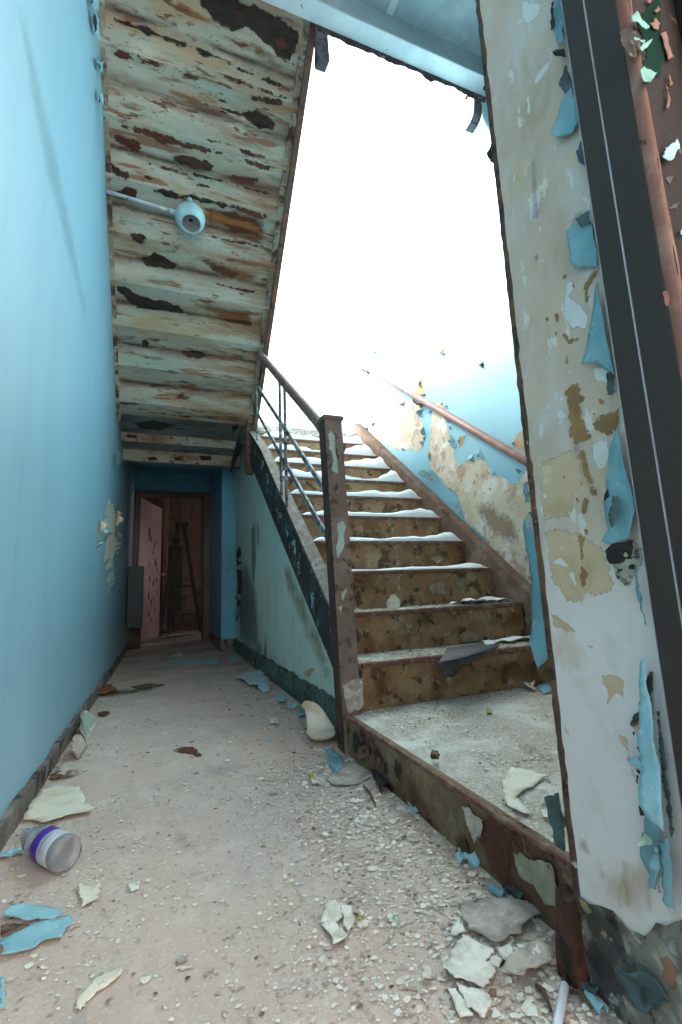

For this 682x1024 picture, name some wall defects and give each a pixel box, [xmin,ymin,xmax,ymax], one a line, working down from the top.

peeling [550,0,585,166]
peeling [620,0,673,109]
peeling [662,138,680,161]
peeling [566,210,597,268]
peeling [581,282,615,395]
peeling [96,498,123,590]
peeling [364,380,646,693]
corrosion [480,812,555,903]
peeling [513,853,557,907]
flaking render [578,657,682,1024]